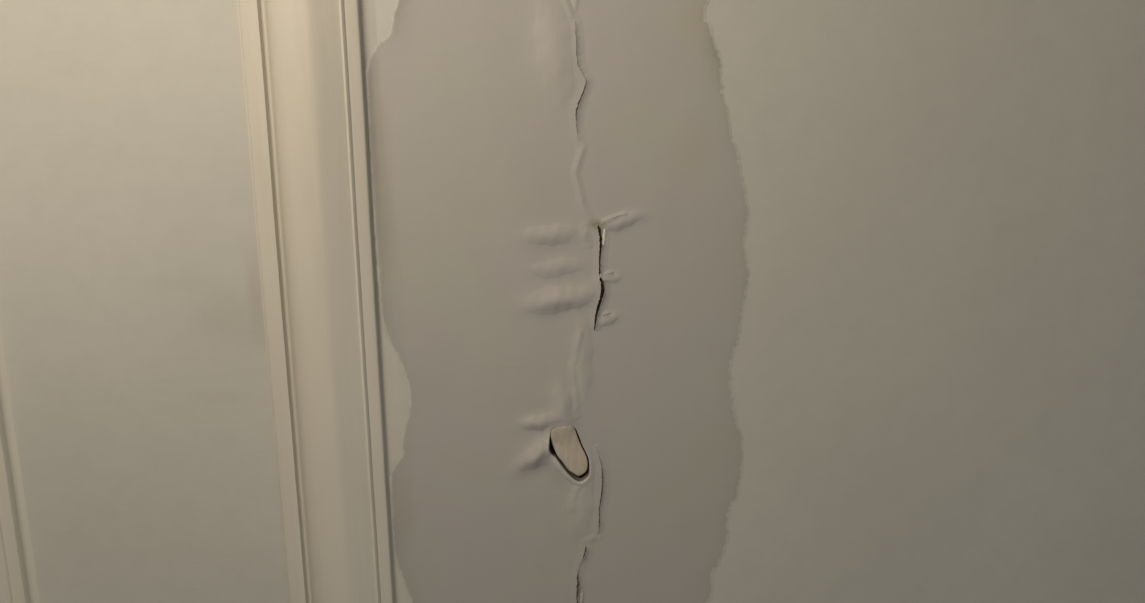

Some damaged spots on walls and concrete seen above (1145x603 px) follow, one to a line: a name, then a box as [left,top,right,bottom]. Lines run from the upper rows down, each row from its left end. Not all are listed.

crack [561,0,627,420]
flaking render [549,426,589,482]
crack [567,442,611,603]